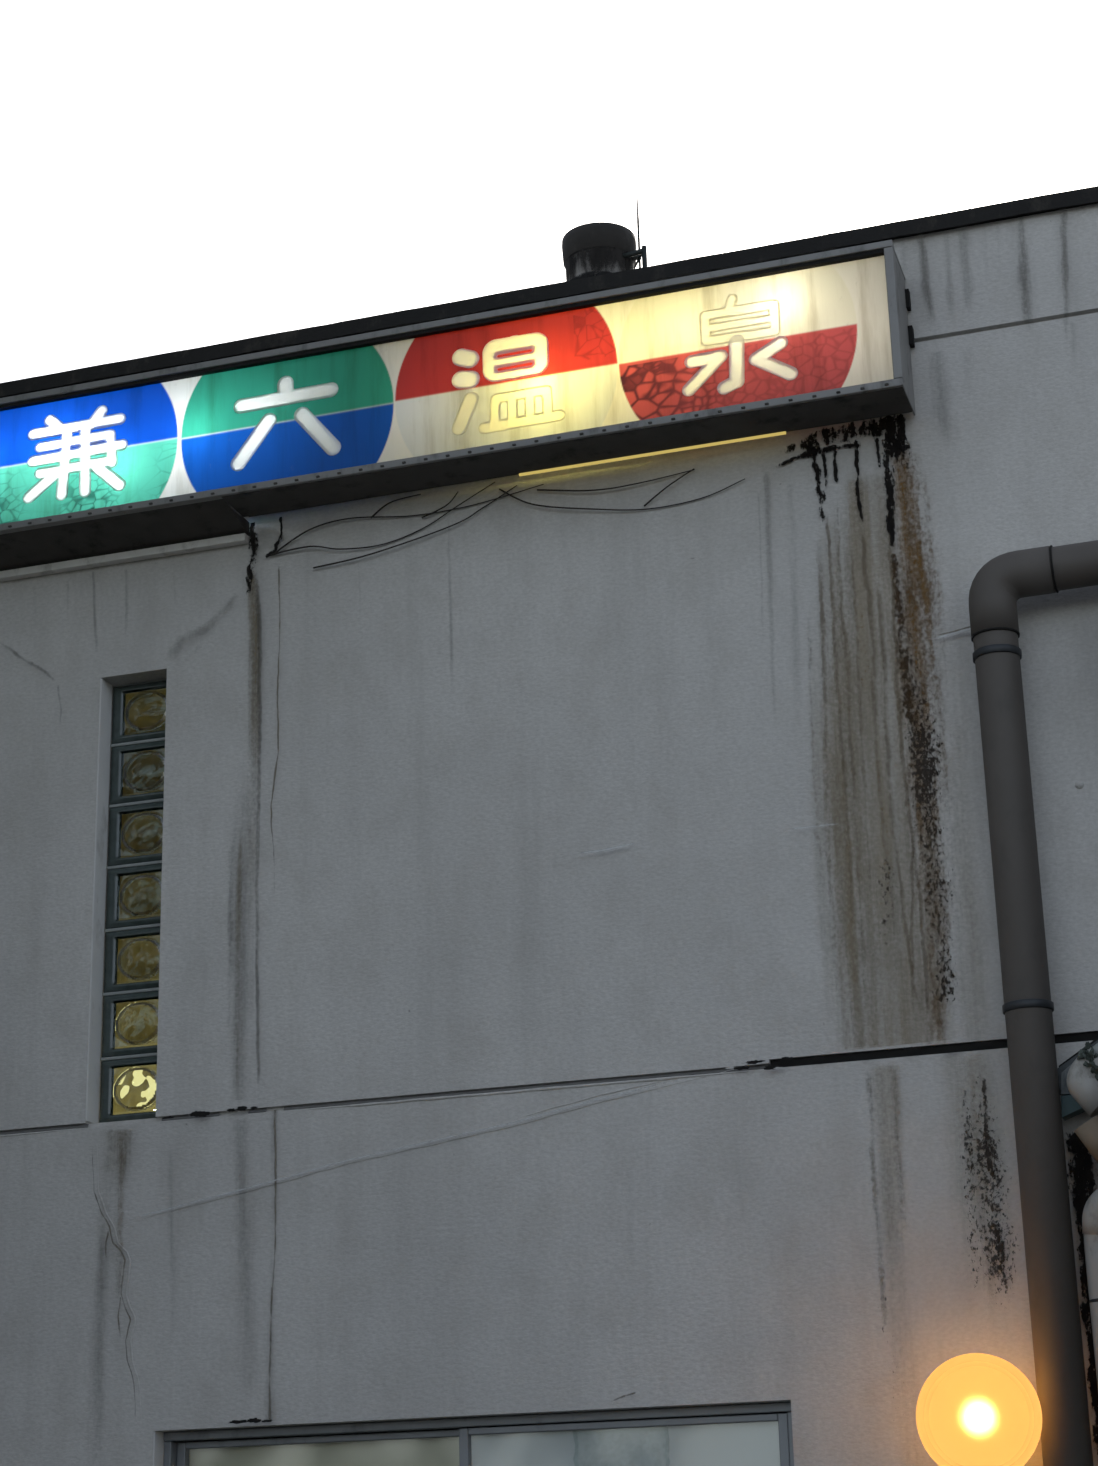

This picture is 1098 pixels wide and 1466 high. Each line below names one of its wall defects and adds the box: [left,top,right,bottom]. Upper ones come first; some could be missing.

leakage [245,517,283,751]
corrosion [831,451,955,1044]
crack [92,1069,733,1420]
leakage [962,1077,1018,1304]